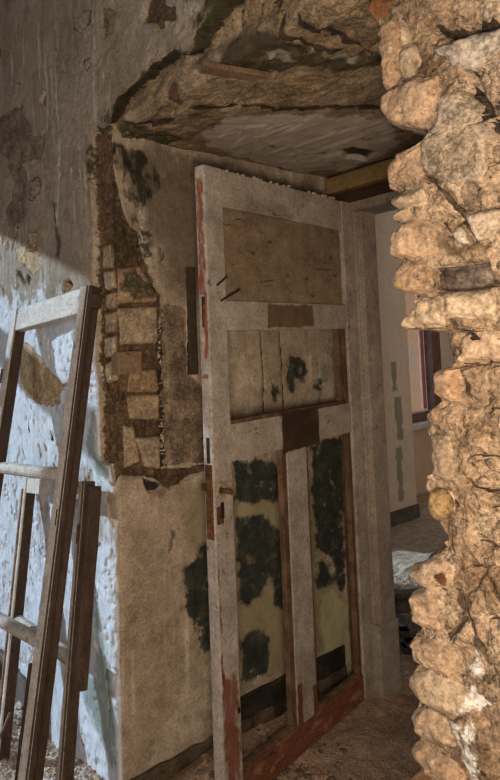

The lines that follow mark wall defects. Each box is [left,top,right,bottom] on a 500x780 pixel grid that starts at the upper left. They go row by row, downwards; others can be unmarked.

flaking render [146,0,201,29]
flaking render [0,108,45,226]
leakage [110,123,182,206]
flaking render [201,15,500,329]
flaking render [89,126,204,491]
flaking render [20,343,68,406]
peeling [286,356,307,393]
flaking render [433,330,500,403]
flaking render [431,434,456,511]
flaking render [408,553,475,780]
leakage [449,651,492,780]